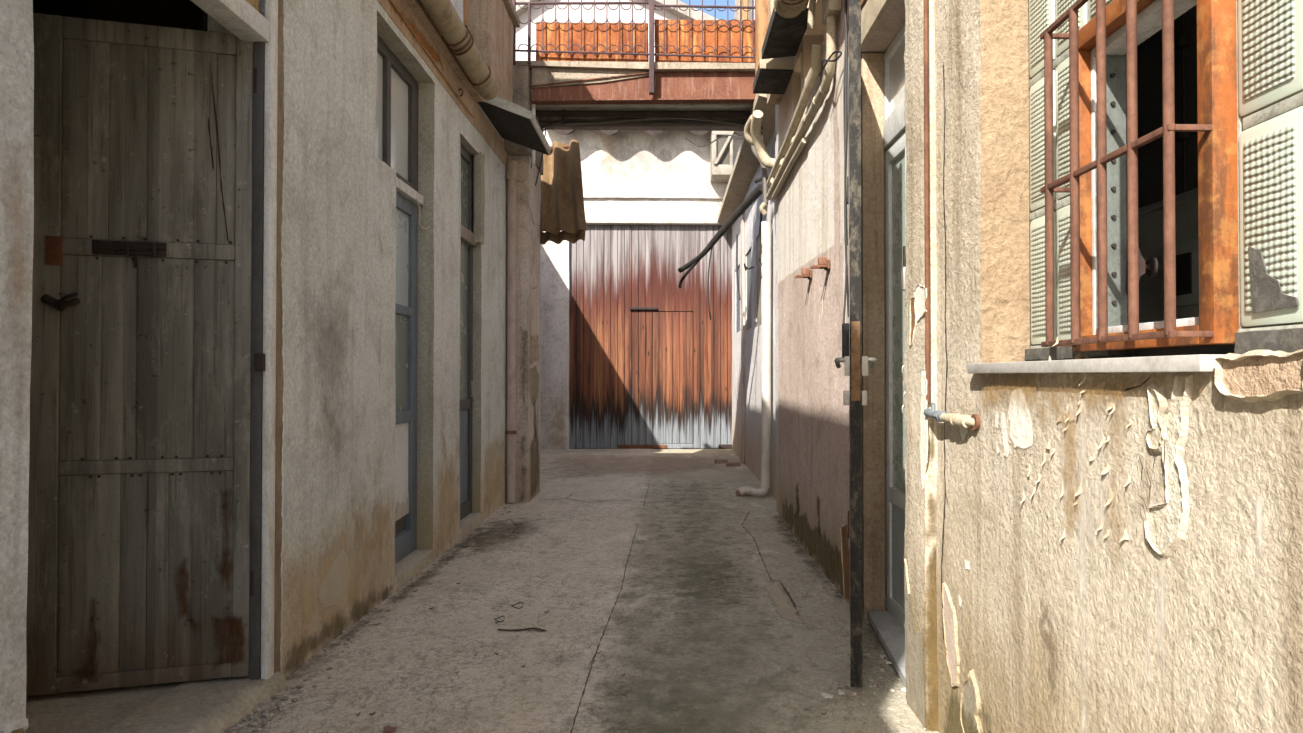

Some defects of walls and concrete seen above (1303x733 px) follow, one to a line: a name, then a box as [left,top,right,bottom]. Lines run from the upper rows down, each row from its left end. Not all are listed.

crack [941,63,977,625]
peeling [995,387,1033,457]
flaking render [1144,372,1193,558]
flaking render [1215,349,1303,403]
corrosion [220,491,232,590]
water stain [286,468,528,670]
water stain [779,485,844,597]
corrosion [214,611,244,664]
peeling [942,582,983,733]
flaking render [0,718,29,733]